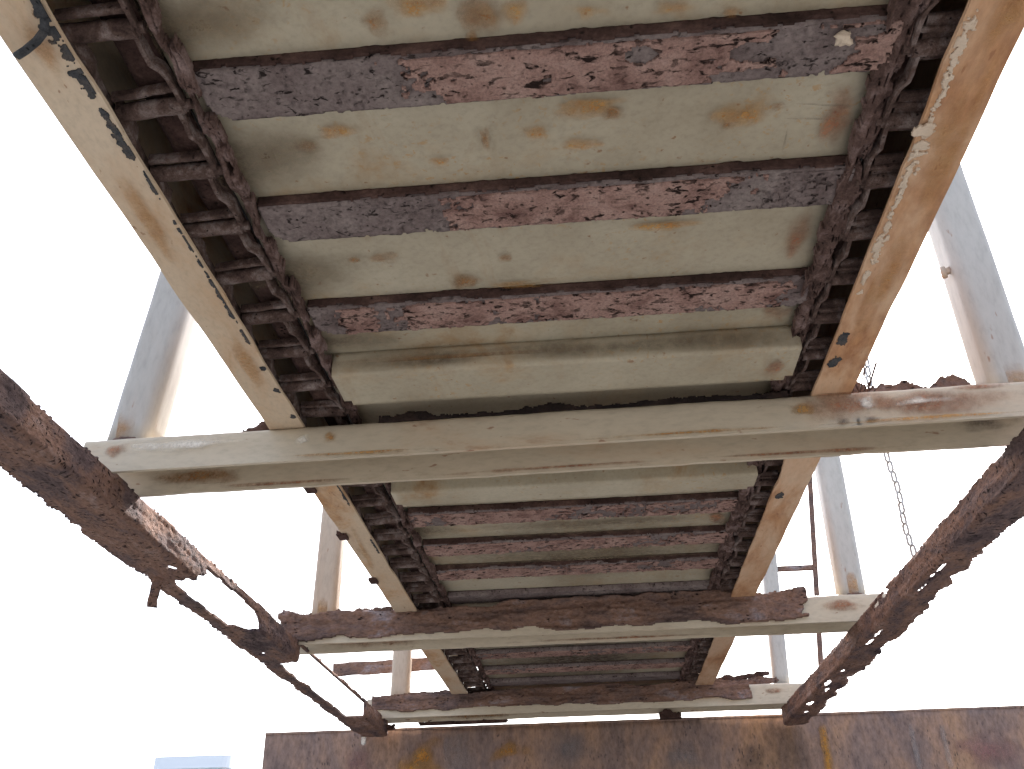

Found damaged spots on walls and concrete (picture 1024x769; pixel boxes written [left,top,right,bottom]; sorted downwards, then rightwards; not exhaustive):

peeling [31,3,136,161]
peeling [856,9,978,295]
peeling [173,220,250,345]
rust [167,470,228,481]
rust [256,480,322,494]
rust [750,448,861,456]
peeling [278,586,809,642]
peeling [372,679,753,712]